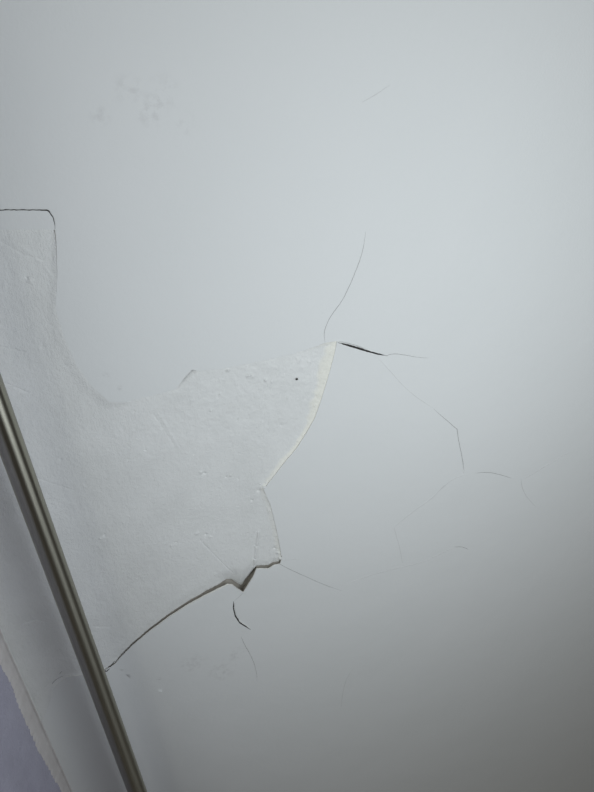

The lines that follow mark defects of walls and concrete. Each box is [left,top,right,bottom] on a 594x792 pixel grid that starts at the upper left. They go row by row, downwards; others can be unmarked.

peeling [0,229,336,670]
crack [324,232,566,506]
peeling [0,457,83,722]
crack [233,594,257,674]